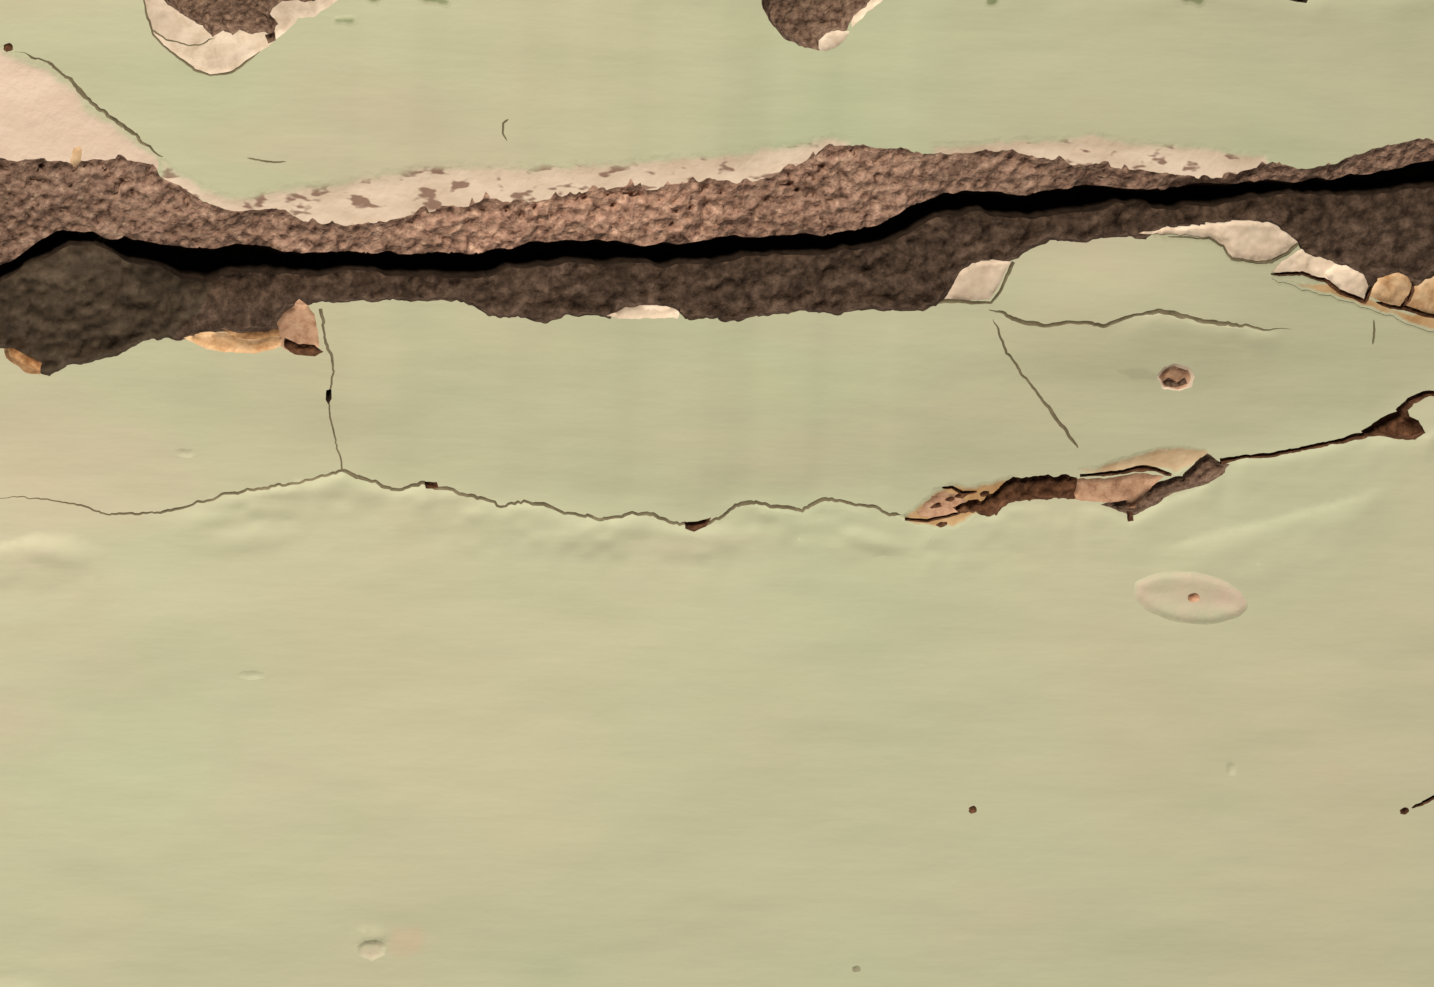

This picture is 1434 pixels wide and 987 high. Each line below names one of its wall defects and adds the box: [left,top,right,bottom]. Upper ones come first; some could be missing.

spalling [143,0,337,76]
spalling [761,0,883,51]
peeling [0,43,857,226]
peeling [927,130,1276,179]
crack [0,52,1434,532]
peeling [945,260,1010,301]
peeling [1139,220,1434,332]
peeling [1157,363,1195,391]